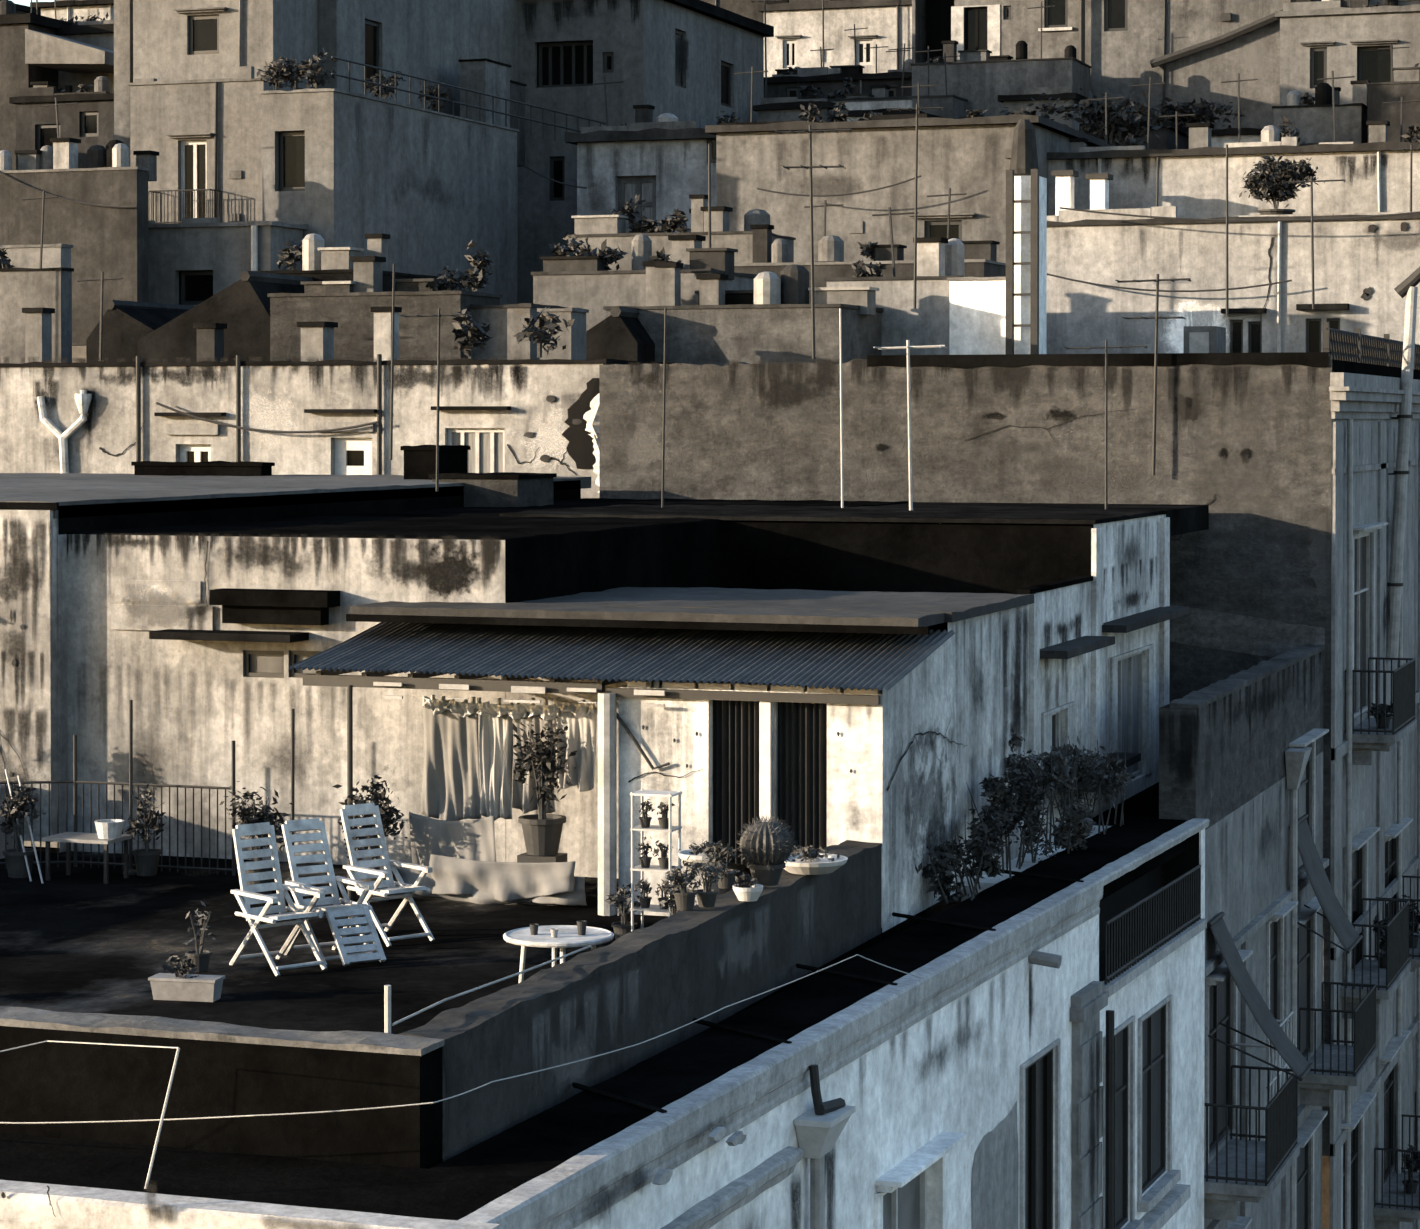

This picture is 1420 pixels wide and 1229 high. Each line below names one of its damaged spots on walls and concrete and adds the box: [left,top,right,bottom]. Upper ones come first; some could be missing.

leakage [755,360,886,407]
leakage [912,367,1131,405]
leakage [0,521,499,763]
leakage [1045,616,1081,665]
leakage [1003,615,1028,766]